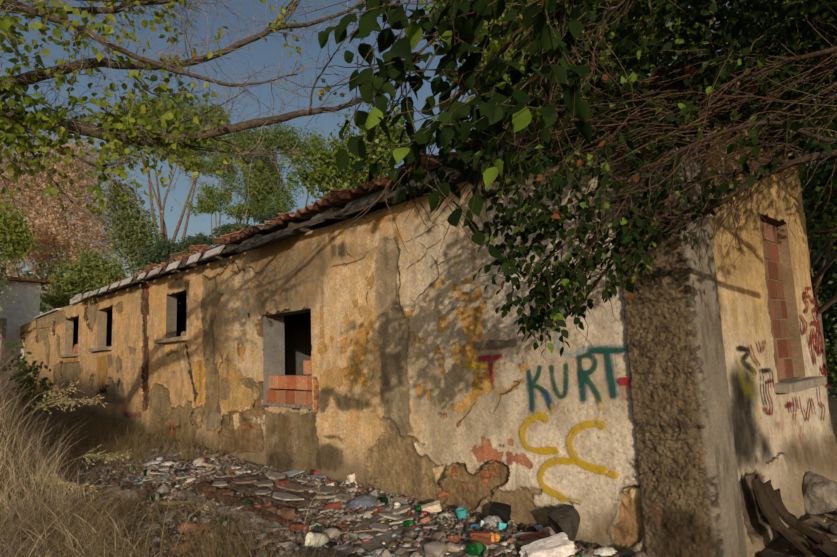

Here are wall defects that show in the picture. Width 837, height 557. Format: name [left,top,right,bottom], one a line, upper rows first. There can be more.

crack [205,261,264,286]
crack [395,219,485,326]
peeling [91,237,561,528]
flaking render [613,484,644,548]